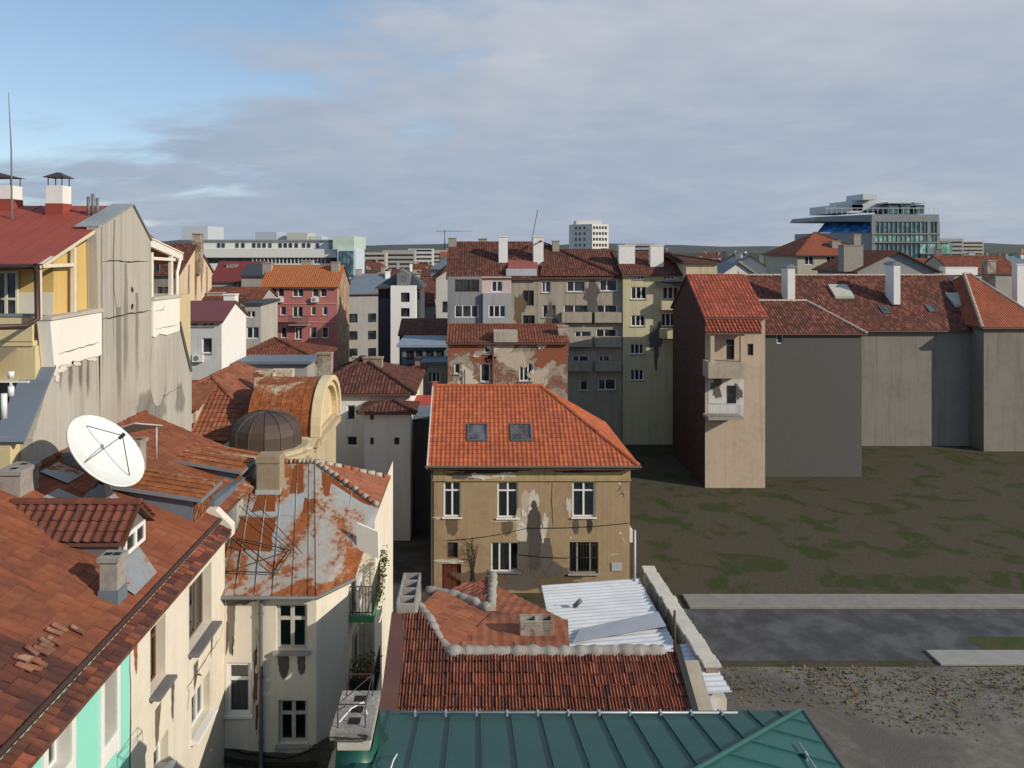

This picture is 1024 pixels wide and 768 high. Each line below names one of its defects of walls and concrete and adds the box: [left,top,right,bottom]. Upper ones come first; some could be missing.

crack [60,260,178,354]
flaking render [446,340,570,386]
corrosion [231,495,277,552]
corrosion [290,465,371,513]
flaking render [491,489,549,543]
spalling [12,622,86,672]